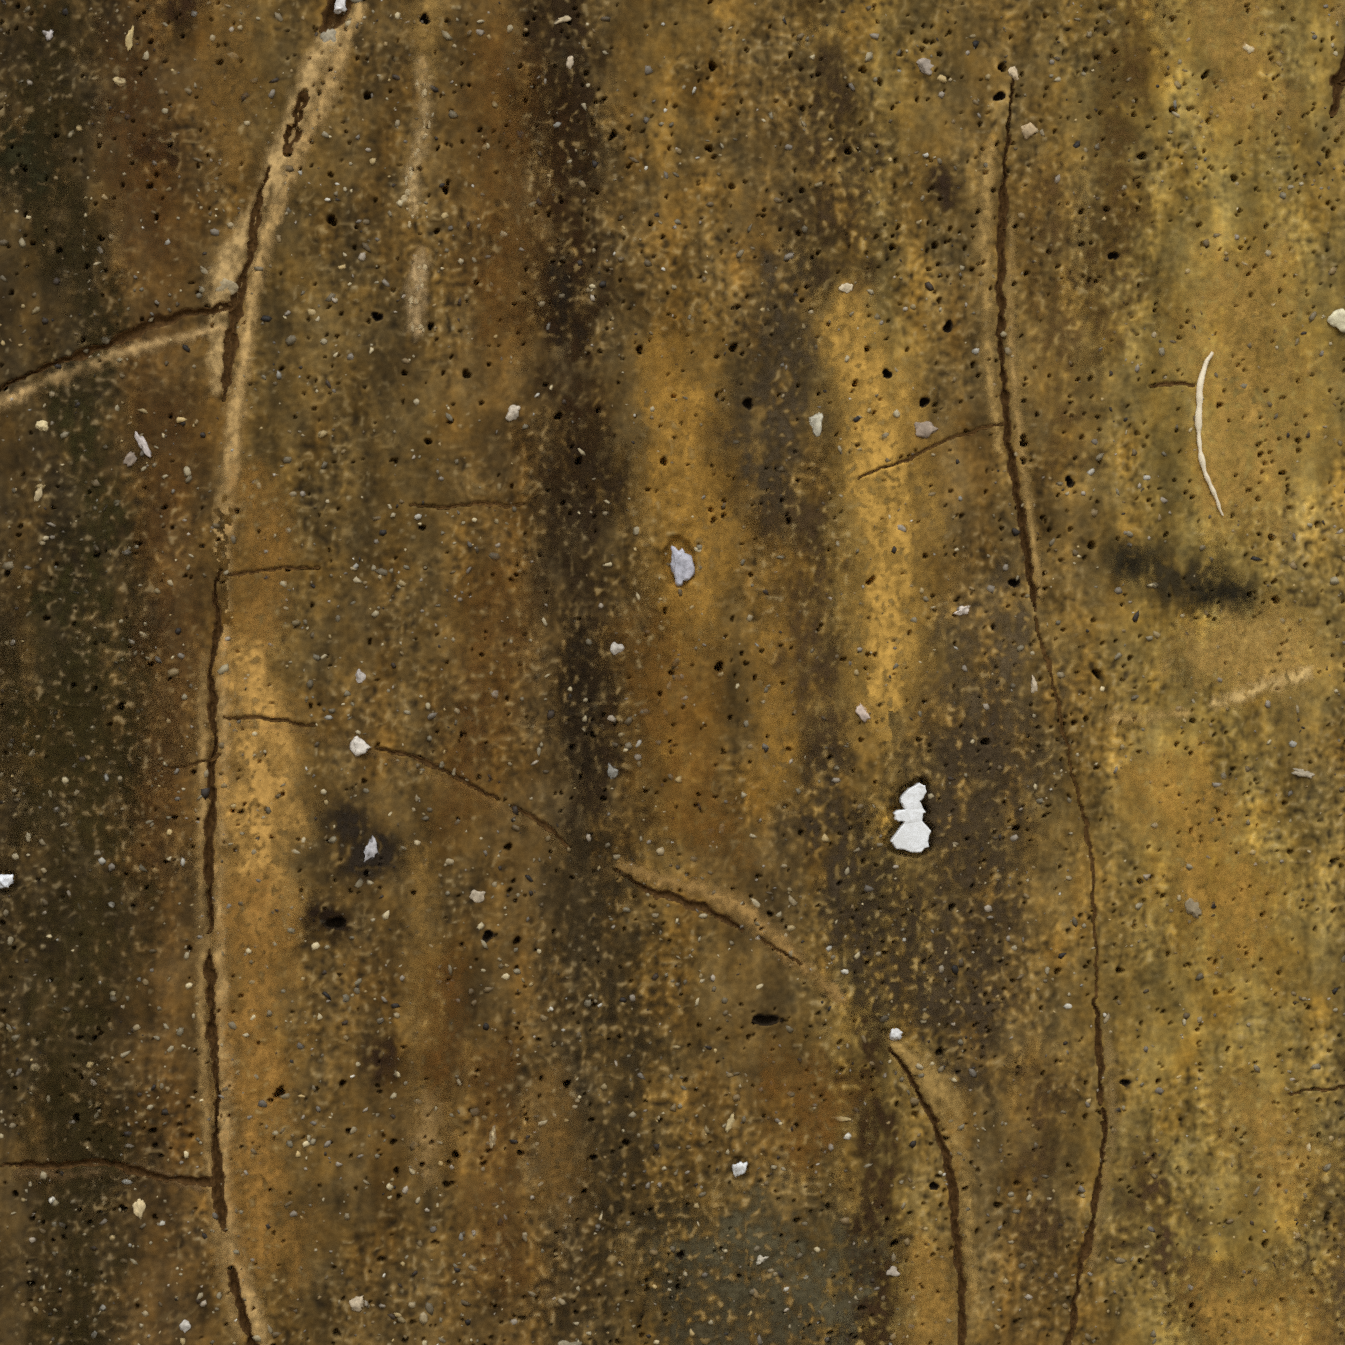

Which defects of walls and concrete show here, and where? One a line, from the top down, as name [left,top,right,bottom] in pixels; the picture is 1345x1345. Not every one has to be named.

crack [1329,47,1345,131]
damp [1190,253,1294,513]
crack [0,0,363,1345]
spalling [670,546,695,586]
crack [858,77,1115,1345]
damp [1112,540,1312,706]
crack [376,747,570,848]
crack [615,863,847,1002]
peeling [890,783,931,853]
damp [1131,760,1268,957]
damp [1128,1154,1345,1345]